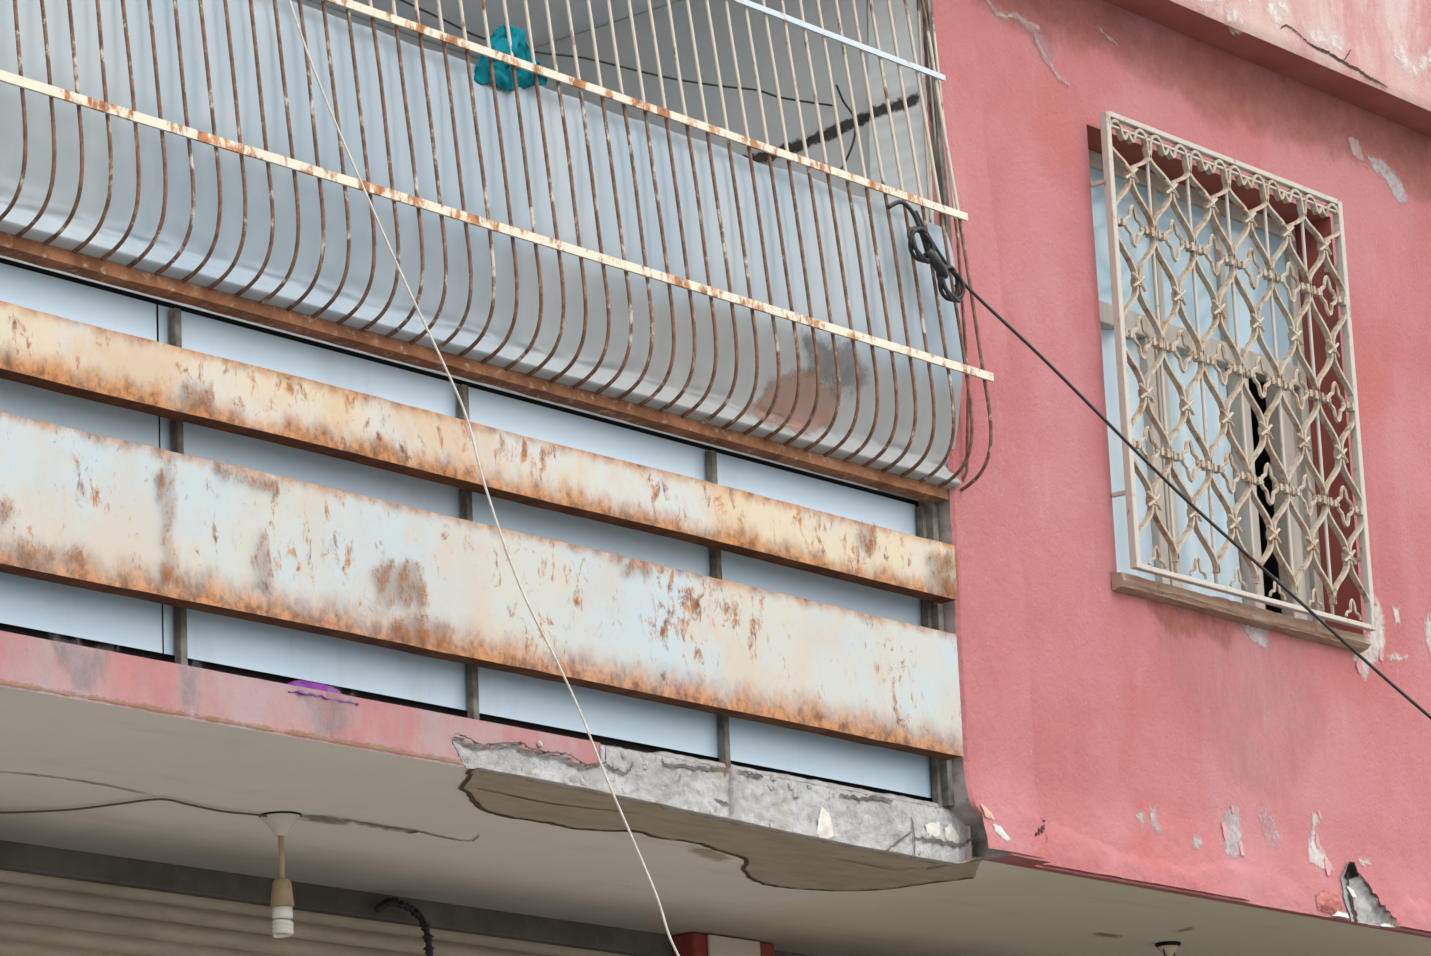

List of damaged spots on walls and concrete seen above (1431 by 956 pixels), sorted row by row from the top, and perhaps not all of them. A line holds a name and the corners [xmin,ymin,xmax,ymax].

crack [985,0,1070,86]
crack [1280,24,1388,88]
peeling [1348,136,1407,203]
rust [156,469,173,538]
rust [216,465,280,494]
rust [162,561,177,583]
rust [376,559,450,650]
peeling [1353,596,1408,681]
crack [0,772,154,796]
crack [352,821,479,842]
spalling [451,735,983,891]
spalling [1308,809,1401,928]